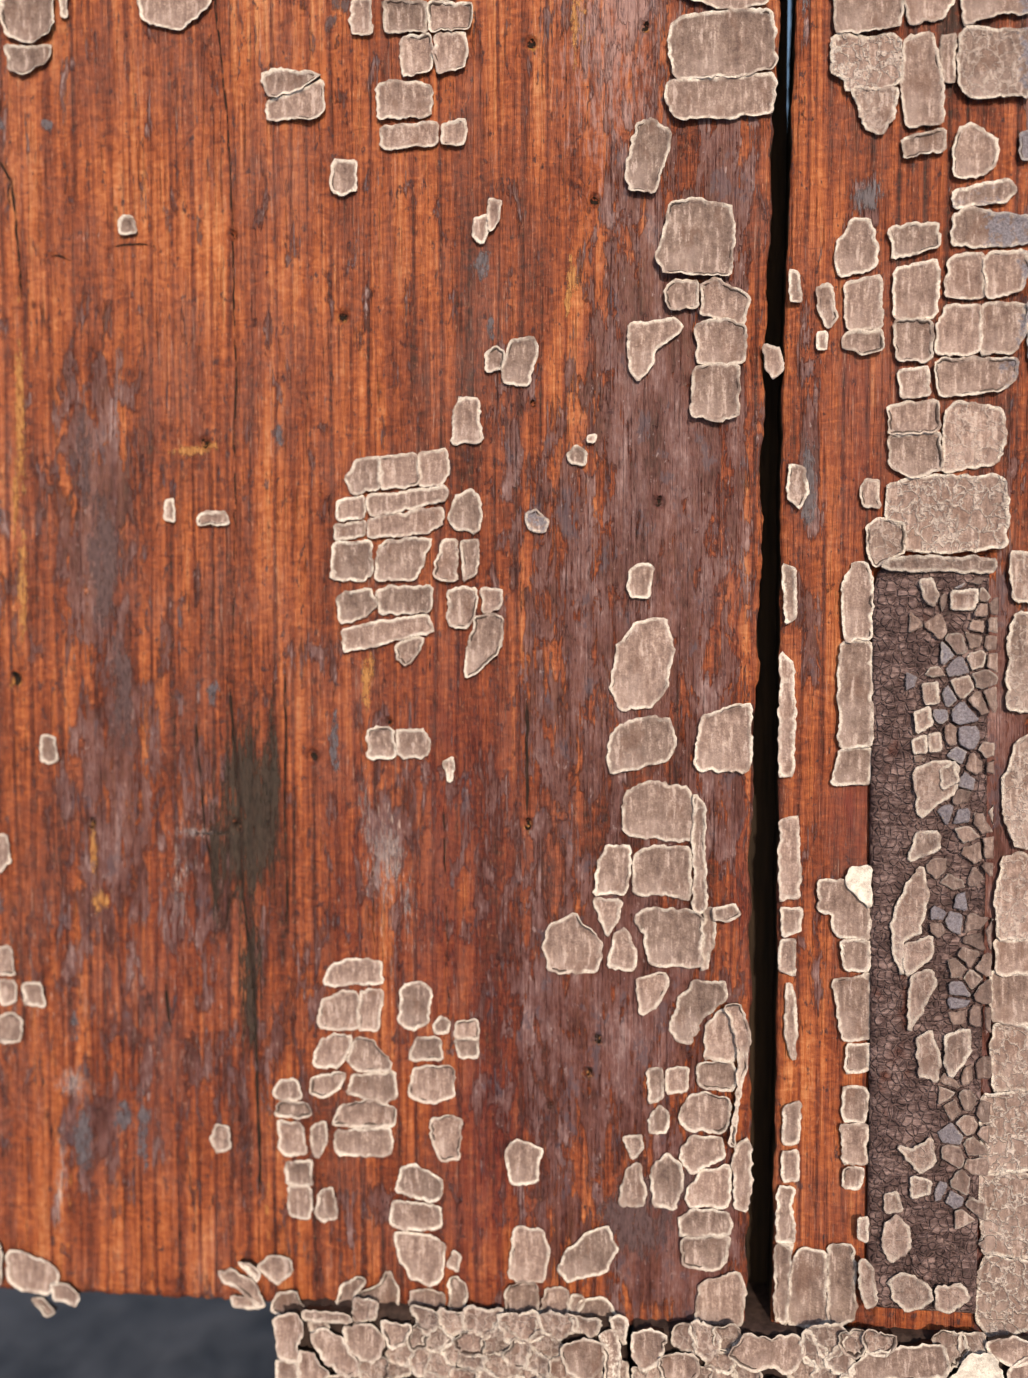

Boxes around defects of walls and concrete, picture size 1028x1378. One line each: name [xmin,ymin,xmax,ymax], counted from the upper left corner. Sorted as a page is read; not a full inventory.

peeling [0,0,69,75]
water stain [209,681,284,1057]
peeling [218,0,1028,1378]